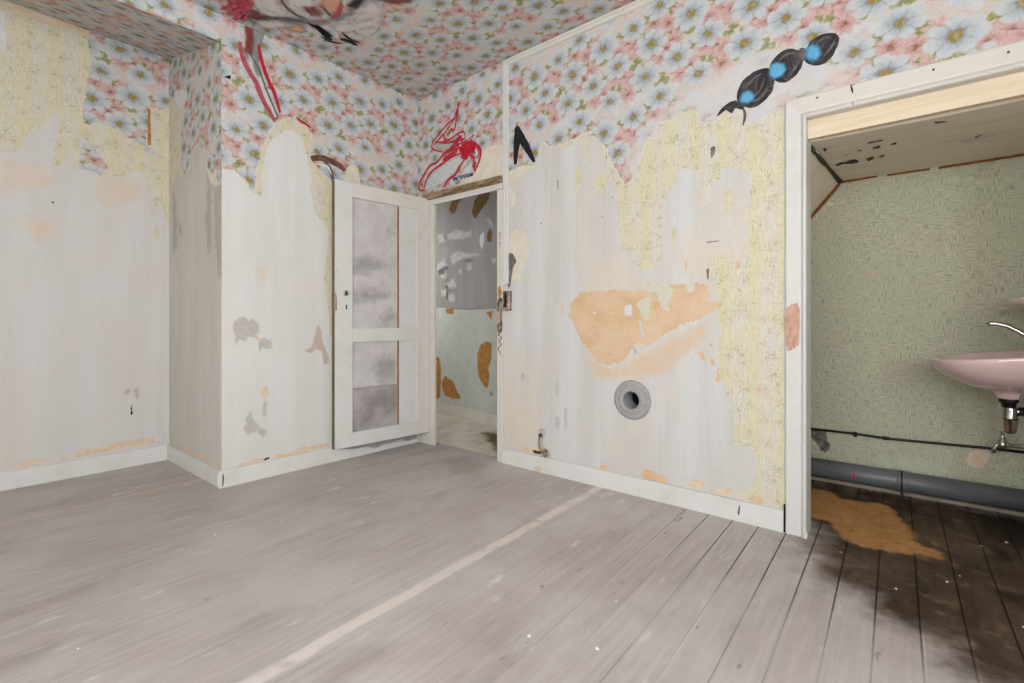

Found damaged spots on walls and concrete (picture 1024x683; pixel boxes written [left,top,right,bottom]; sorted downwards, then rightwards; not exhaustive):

flaking render [561,268,723,389]
peeling [785,303,800,351]
flaking render [60,438,154,461]
flaking render [519,447,543,473]
flaking render [642,469,667,483]
damp [722,479,1024,683]